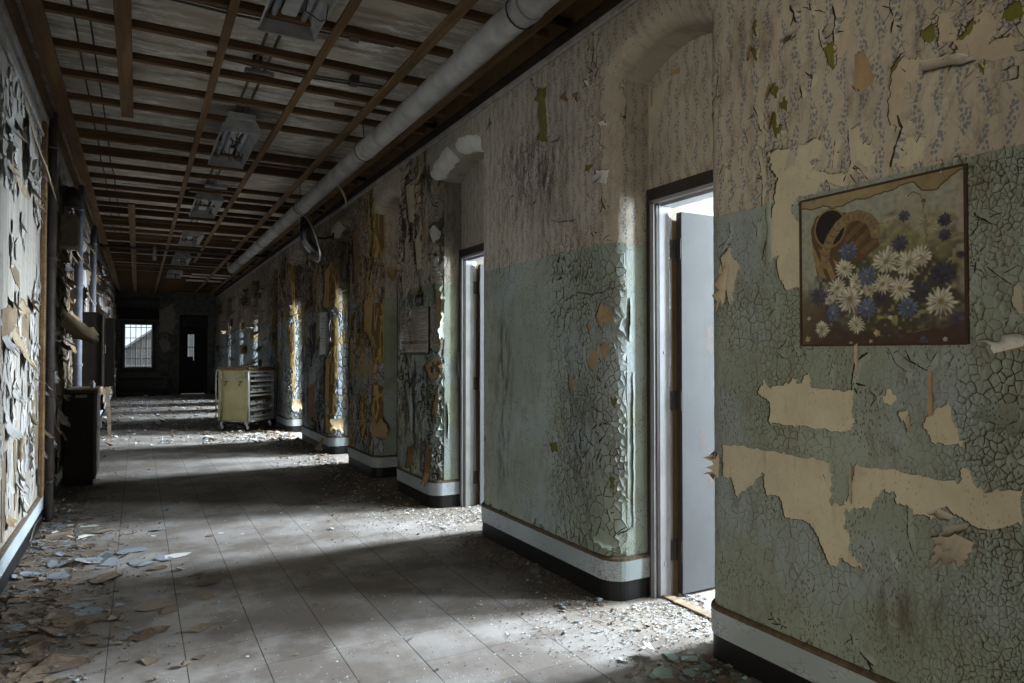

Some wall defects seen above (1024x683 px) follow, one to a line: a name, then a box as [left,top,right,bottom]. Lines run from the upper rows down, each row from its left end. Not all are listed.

peeling [1,74,75,215]
peeling [1,225,119,543]
peeling [286,264,303,418]
peeling [309,256,344,448]
peeling [361,284,385,453]
peeling [403,290,446,487]
crack [484,27,639,557]
spalling [594,271,627,365]
peeling [711,242,744,311]
peeling [759,89,928,295]
peeling [703,367,1024,578]
crack [711,0,1024,683]